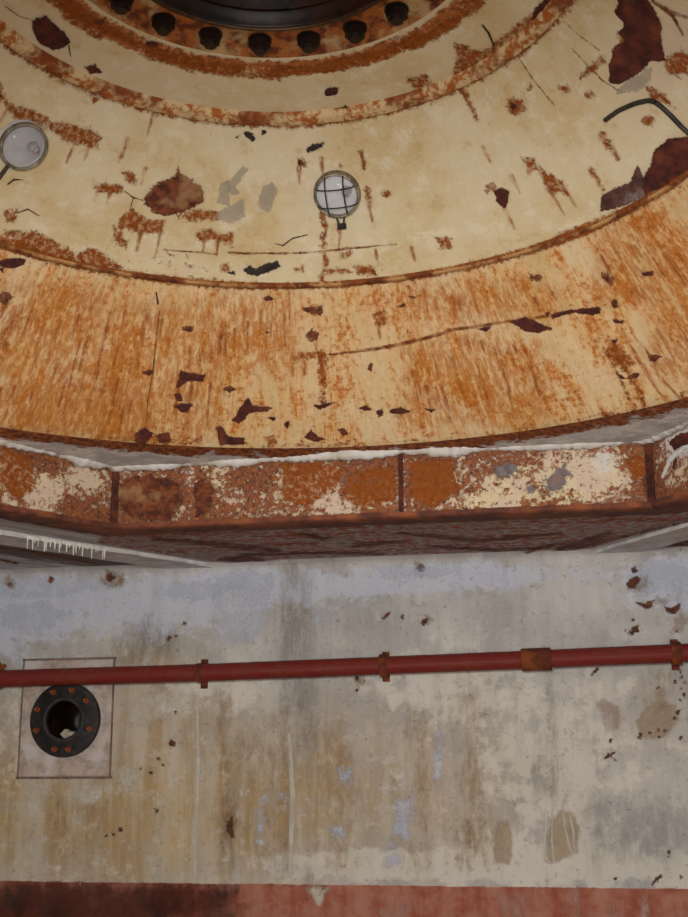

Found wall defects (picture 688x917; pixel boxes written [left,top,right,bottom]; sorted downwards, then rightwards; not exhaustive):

peeling [5,6,71,56]
rust [47,0,486,81]
peeling [579,0,665,94]
rust [0,83,102,160]
spalling [143,167,247,223]
peeling [599,136,688,211]
rust [4,209,123,269]
rust [113,208,164,249]
rust [661,432,688,478]
damp [25,534,108,560]
damp [225,810,237,838]
damp [287,733,295,878]